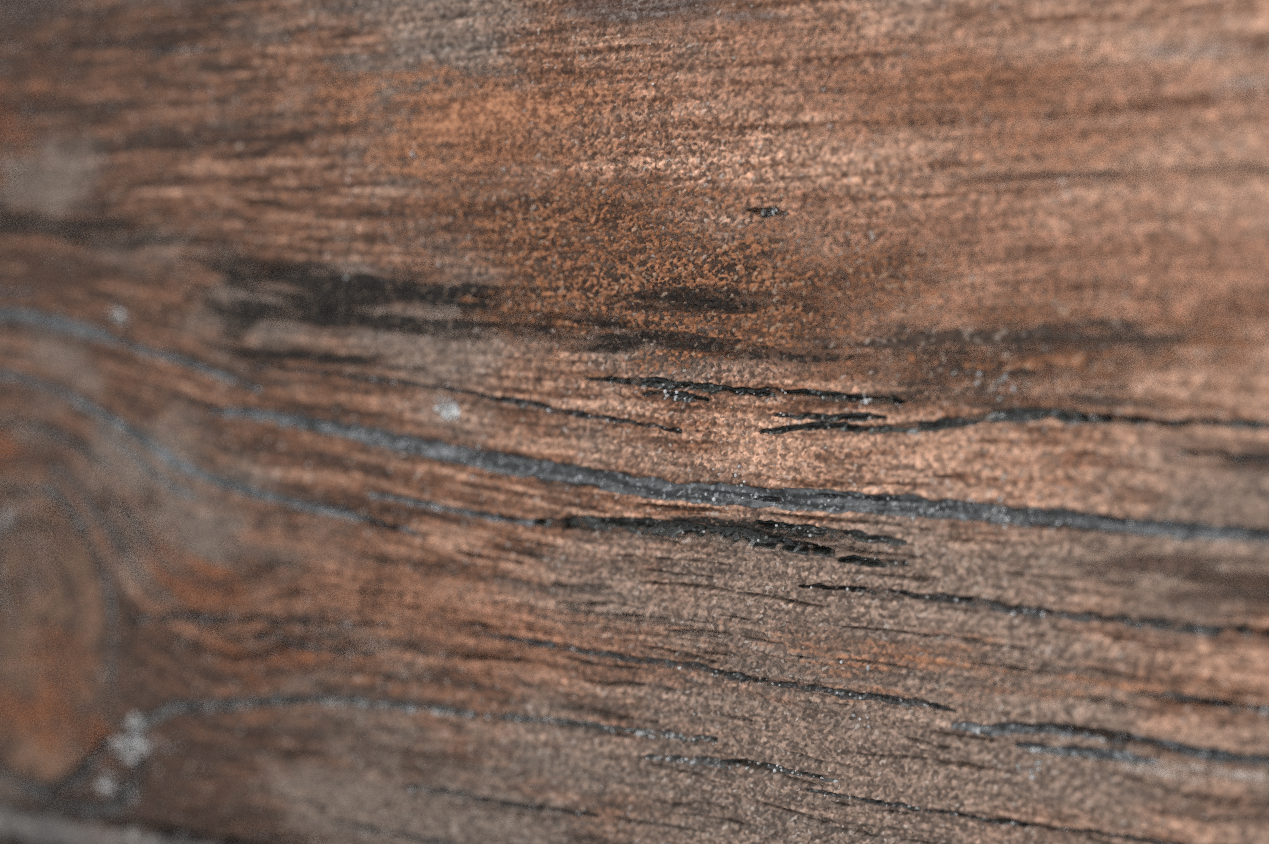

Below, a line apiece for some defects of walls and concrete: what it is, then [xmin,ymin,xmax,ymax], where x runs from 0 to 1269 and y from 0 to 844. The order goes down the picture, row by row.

crack [0,287,1269,638]
crack [120,611,389,657]
crack [127,693,1187,844]
crack [474,630,1269,765]